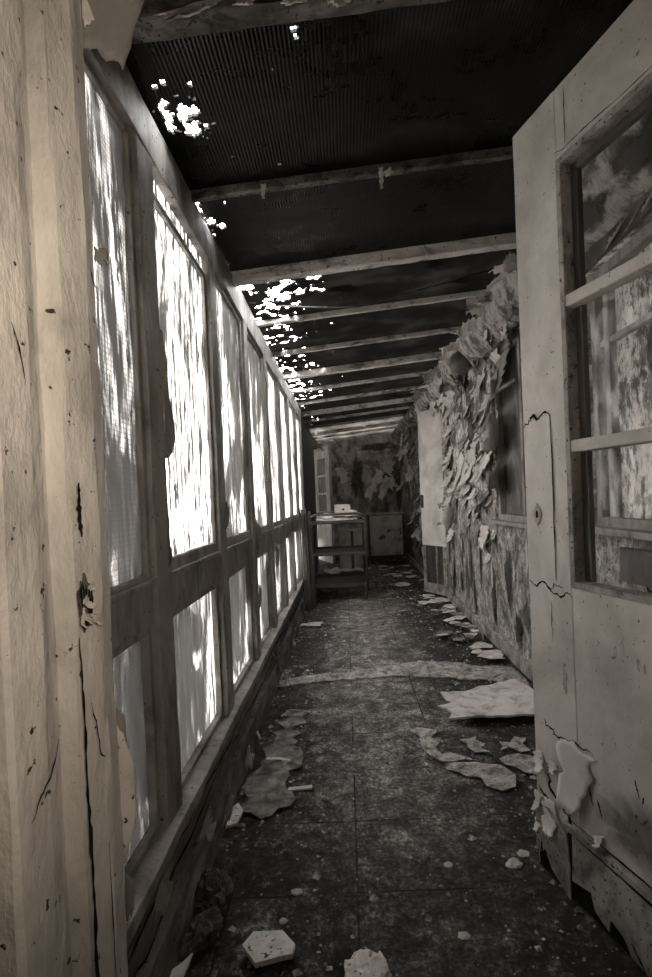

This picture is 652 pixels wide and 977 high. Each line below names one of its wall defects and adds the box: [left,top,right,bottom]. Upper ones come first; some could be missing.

peeling [364,252,517,563]
peeling [333,451,352,504]
crack [523,411,572,642]
peeling [531,719,602,838]
peeling [592,835,604,849]